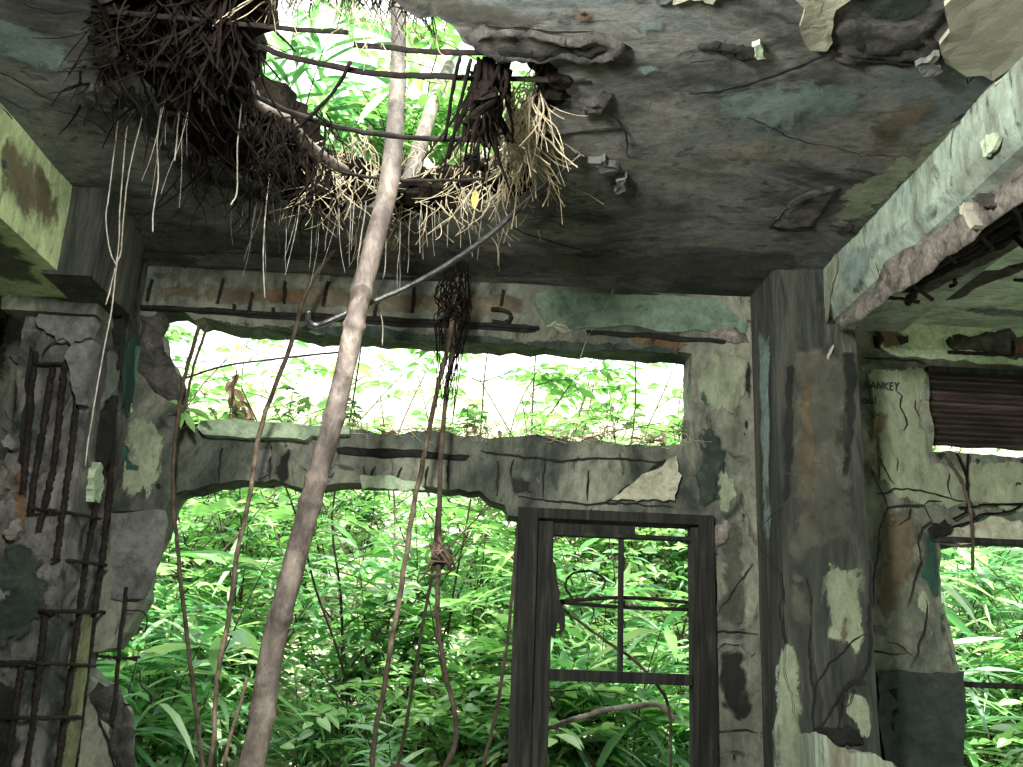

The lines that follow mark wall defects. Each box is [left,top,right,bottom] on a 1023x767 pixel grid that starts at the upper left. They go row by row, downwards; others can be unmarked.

crack [0,72,142,145]
crack [23,0,154,108]
spalling [84,7,632,202]
flaking render [796,0,1023,87]
damp [1,139,58,232]
spalling [825,164,1023,329]
crack [897,391,919,431]
flaking render [0,249,357,767]
spalling [605,456,682,503]
crack [716,457,966,733]
peeling [823,563,914,658]
damp [878,513,917,619]